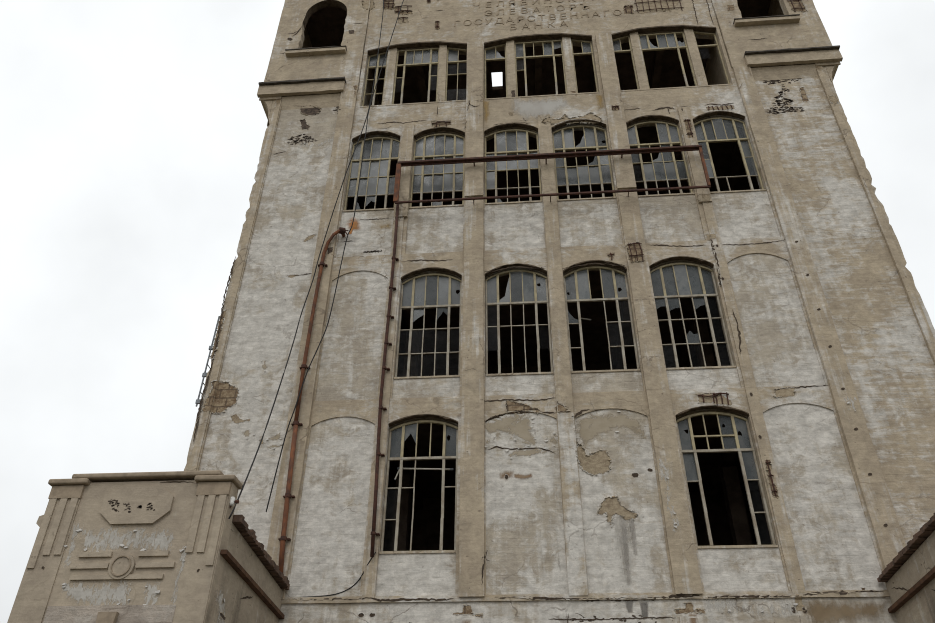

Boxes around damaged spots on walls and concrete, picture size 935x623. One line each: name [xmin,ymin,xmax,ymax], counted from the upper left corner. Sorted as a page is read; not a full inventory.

spalling [763,78,808,114]
spalling [287,105,334,147]
spalling [201,380,283,449]
peeling [484,400,557,459]
peeling [574,411,646,476]
spalling [596,496,638,527]